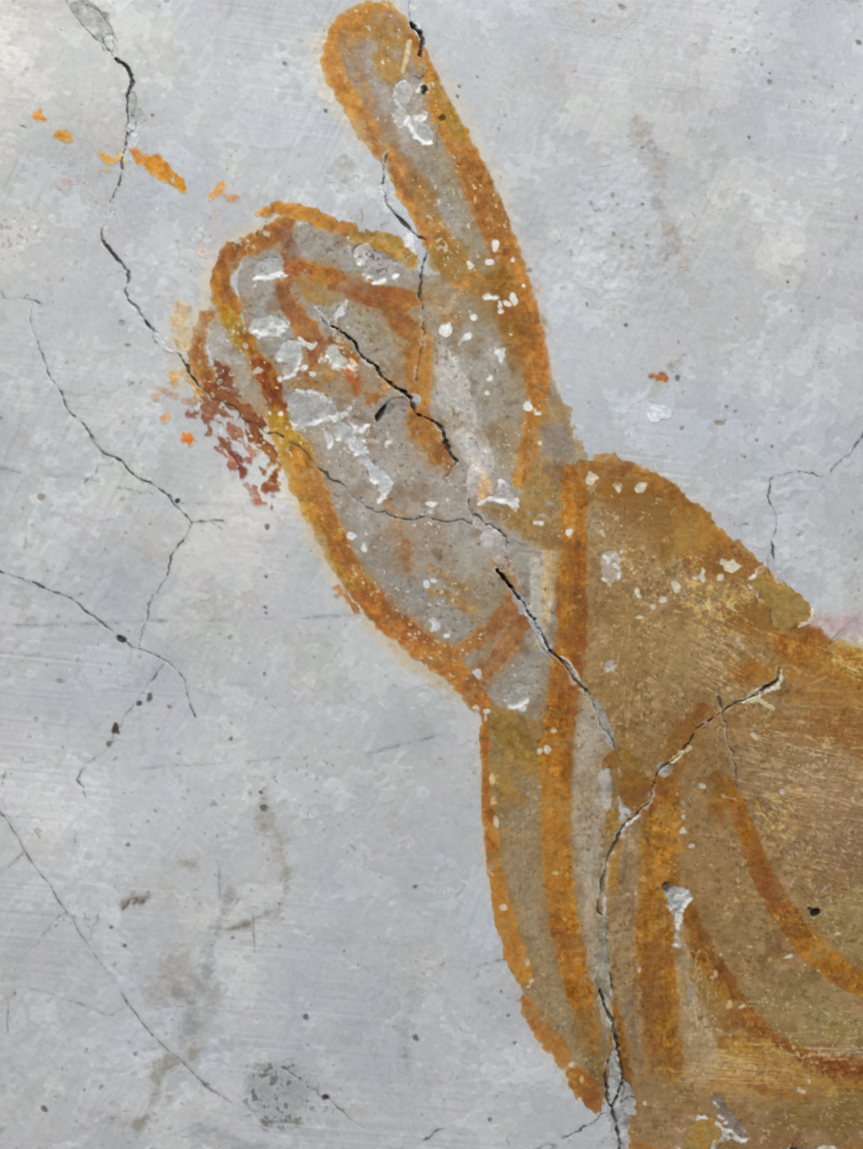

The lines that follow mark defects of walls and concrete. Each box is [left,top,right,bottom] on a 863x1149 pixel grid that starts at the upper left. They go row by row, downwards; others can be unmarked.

peeling [253,257,289,288]
peeling [347,236,401,286]
peeling [439,314,478,346]
peeling [483,284,526,315]
peeling [249,311,394,505]
crack [60,0,621,812]
crack [0,291,227,799]
crack [739,436,863,635]
crack [539,668,785,1149]
peeling [662,882,693,949]
crack [282,1067,363,1128]
crack [423,1129,445,1143]